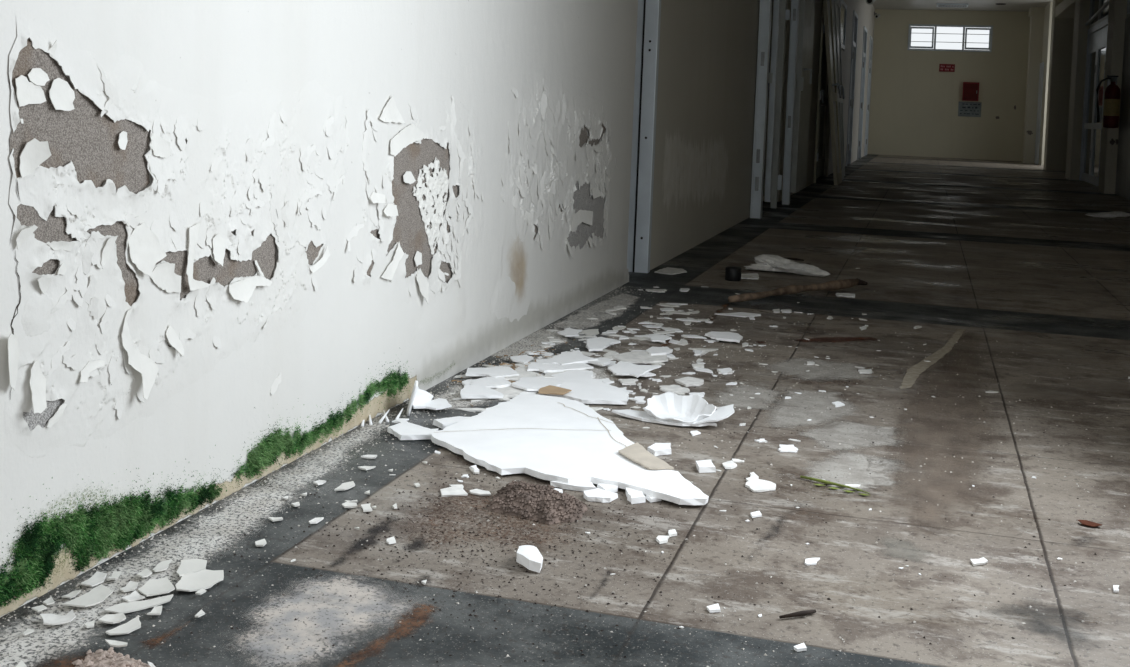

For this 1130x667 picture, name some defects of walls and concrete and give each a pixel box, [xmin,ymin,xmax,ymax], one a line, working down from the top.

peeling [9,38,170,194]
peeling [579,123,606,152]
peeling [367,95,457,303]
peeling [559,181,604,257]
crack [11,252,21,335]
peeling [14,204,276,400]
peeling [8,333,67,430]
damp [0,261,629,616]
damp [240,577,415,667]
rust [336,604,434,667]